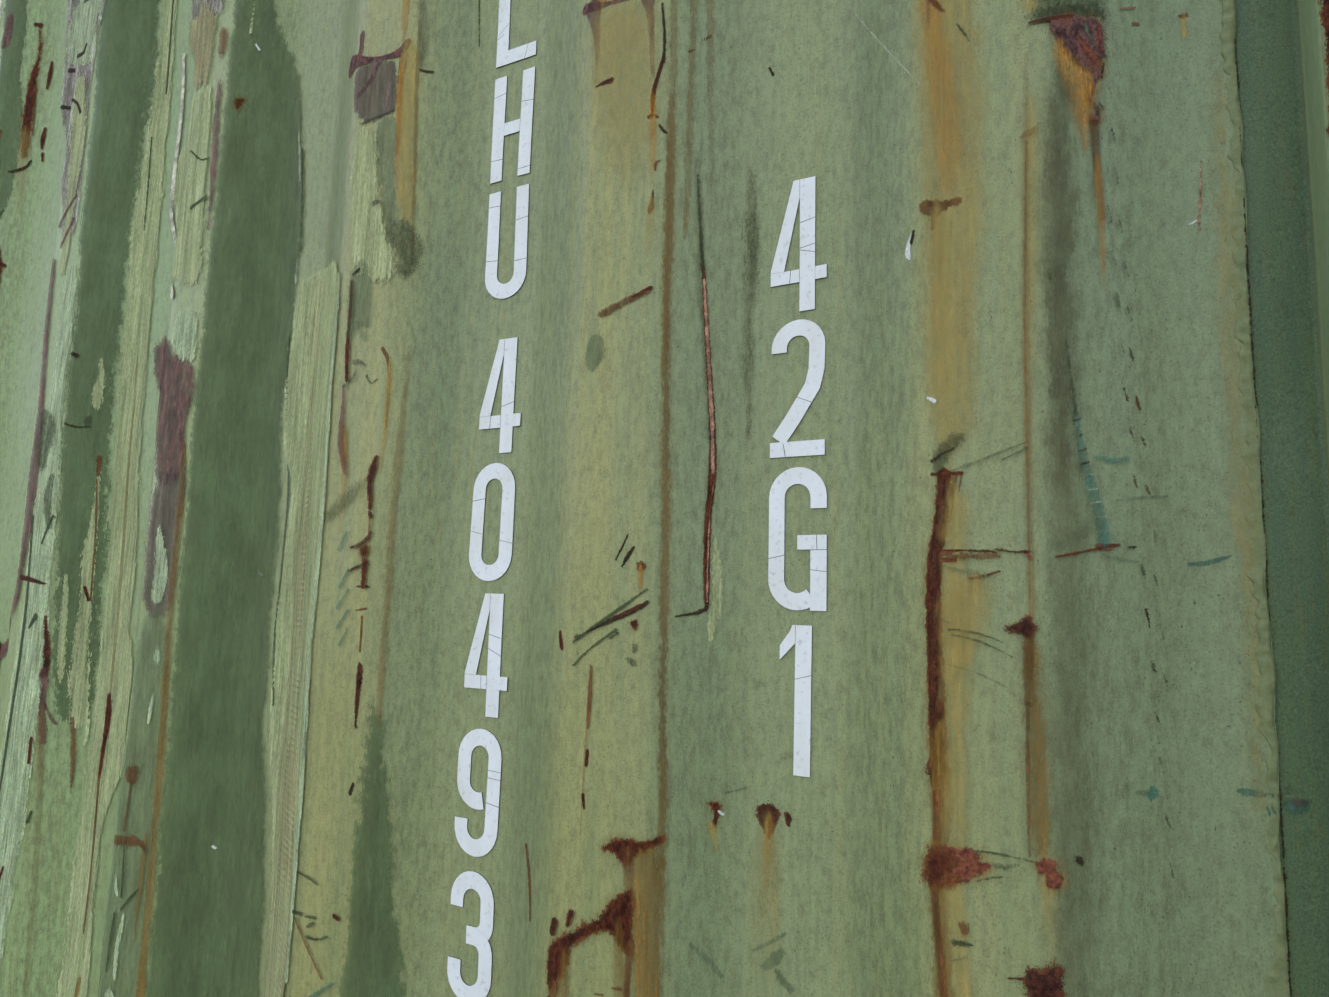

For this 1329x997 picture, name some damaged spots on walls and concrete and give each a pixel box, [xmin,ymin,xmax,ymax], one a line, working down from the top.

rust [582,0,626,44]
rust [642,0,655,43]
rust [1318,0,1329,133]
peeling [348,30,411,331]
rust [917,467,1069,997]
rust [545,834,666,997]